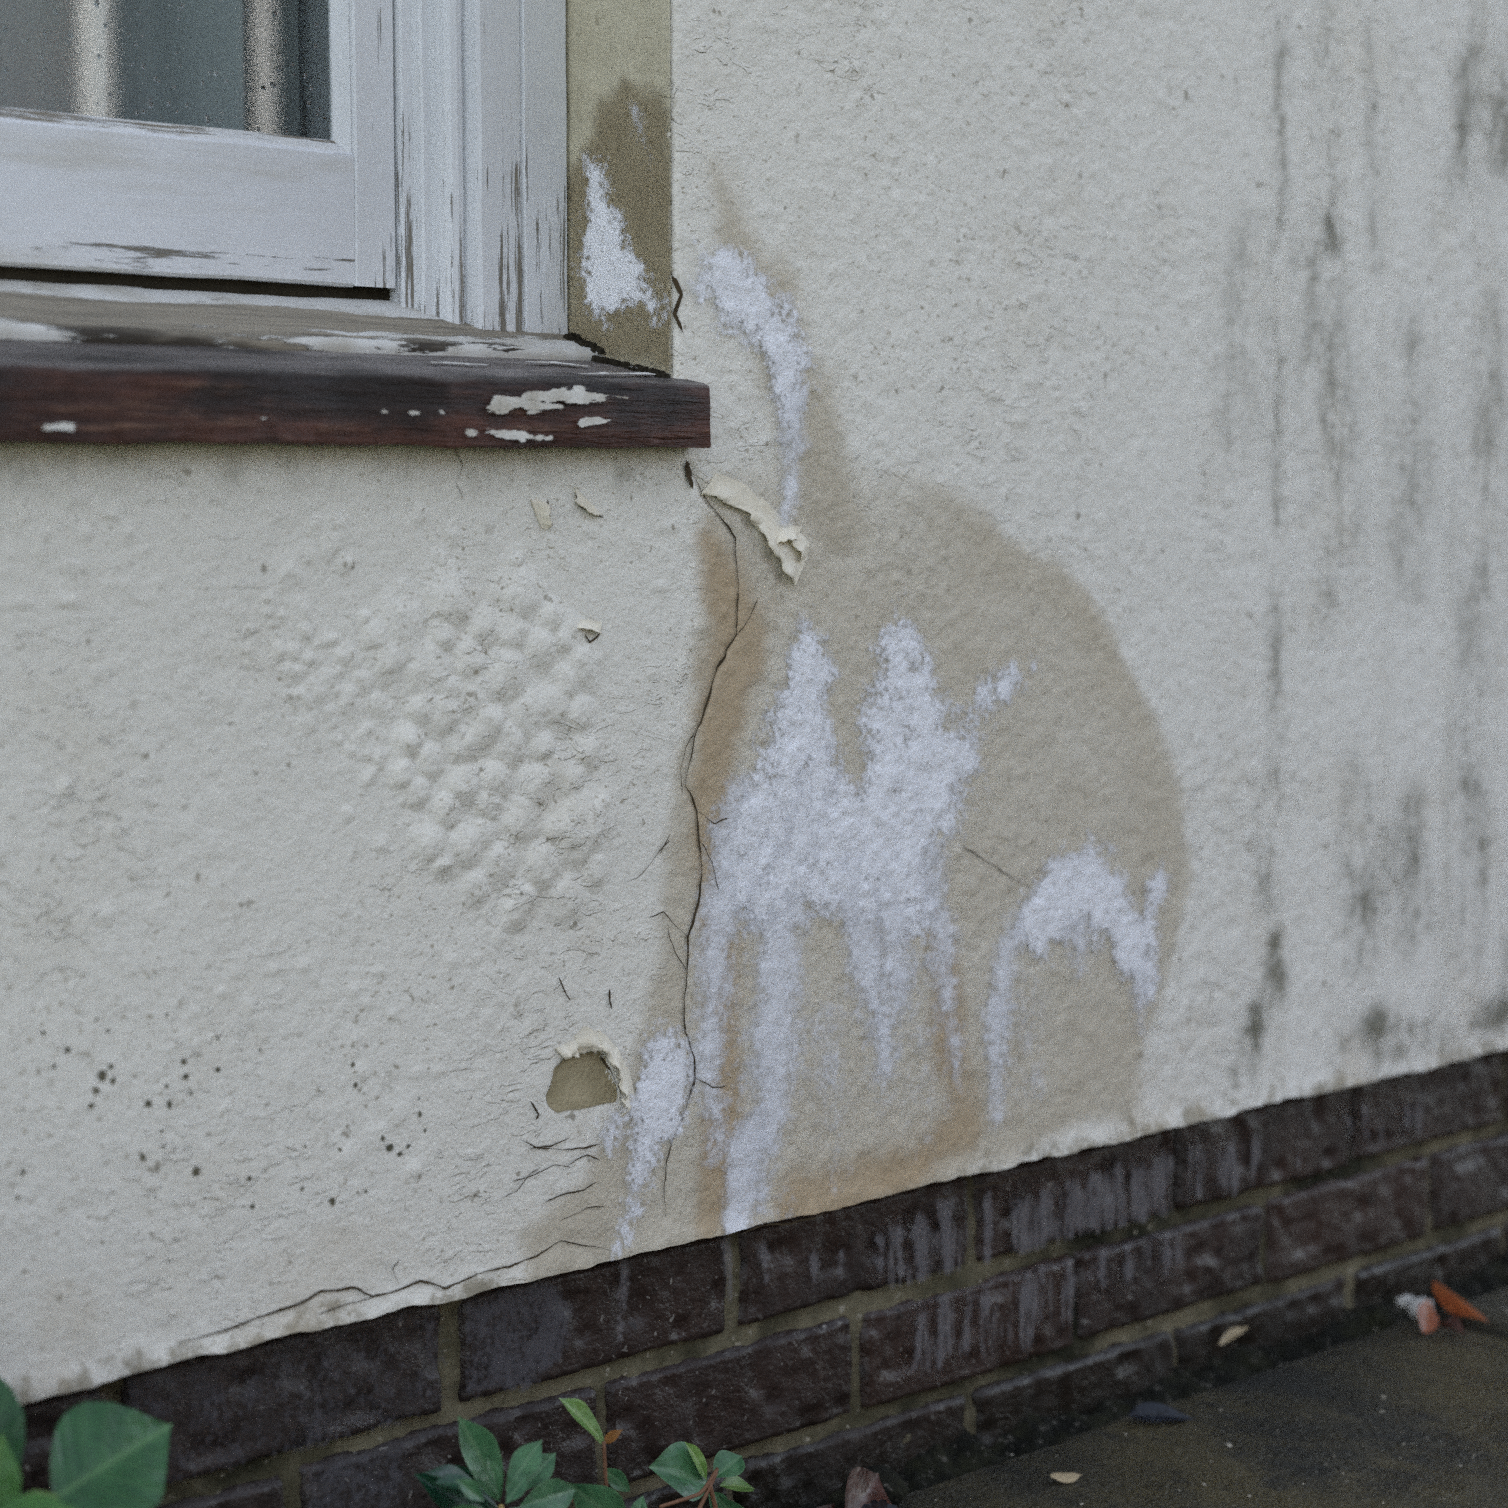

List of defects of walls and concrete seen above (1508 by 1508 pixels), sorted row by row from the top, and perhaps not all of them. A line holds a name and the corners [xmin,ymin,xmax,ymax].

water stain [569,84,671,366]
peeling [43,423,75,431]
peeling [465,361,674,442]
water stain [689,208,852,540]
peeling [701,472,810,585]
crack [630,460,758,1207]
spalling [531,1026,635,1120]
water stain [466,505,1186,1391]
water stain [1245,930,1286,1067]
water stain [1352,1012,1428,1057]
crack [171,1137,607,1347]